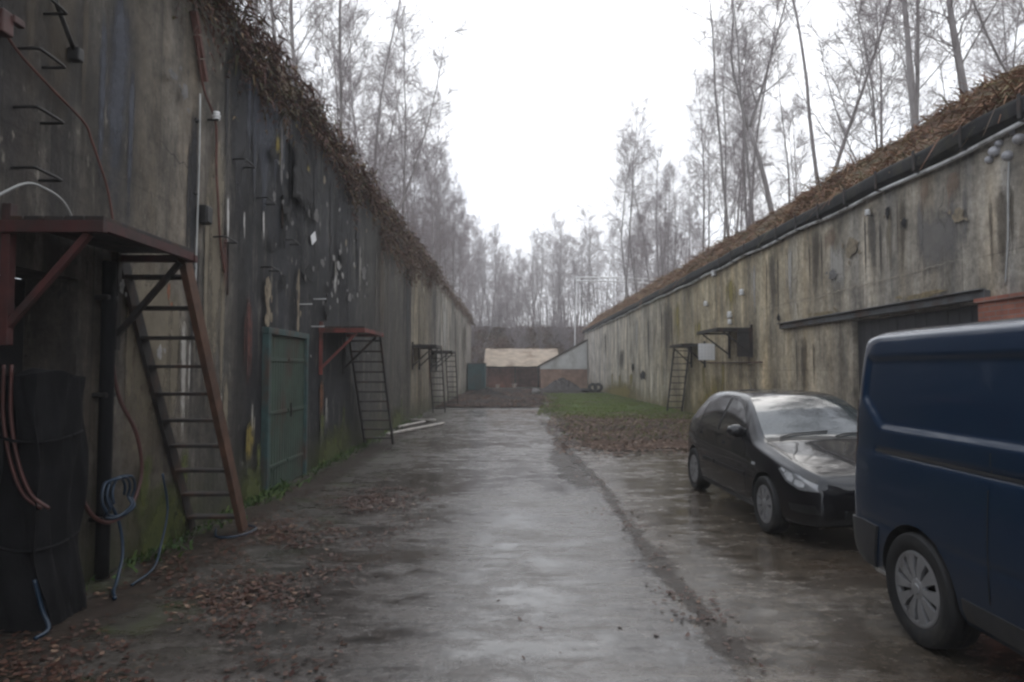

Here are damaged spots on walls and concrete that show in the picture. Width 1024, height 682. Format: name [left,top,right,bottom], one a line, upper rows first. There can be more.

peeling [265,276,273,327]
spalling [320,239,368,304]
water stain [751,249,792,306]
water stain [808,234,843,283]
water stain [864,203,905,269]
water stain [989,192,1013,272]